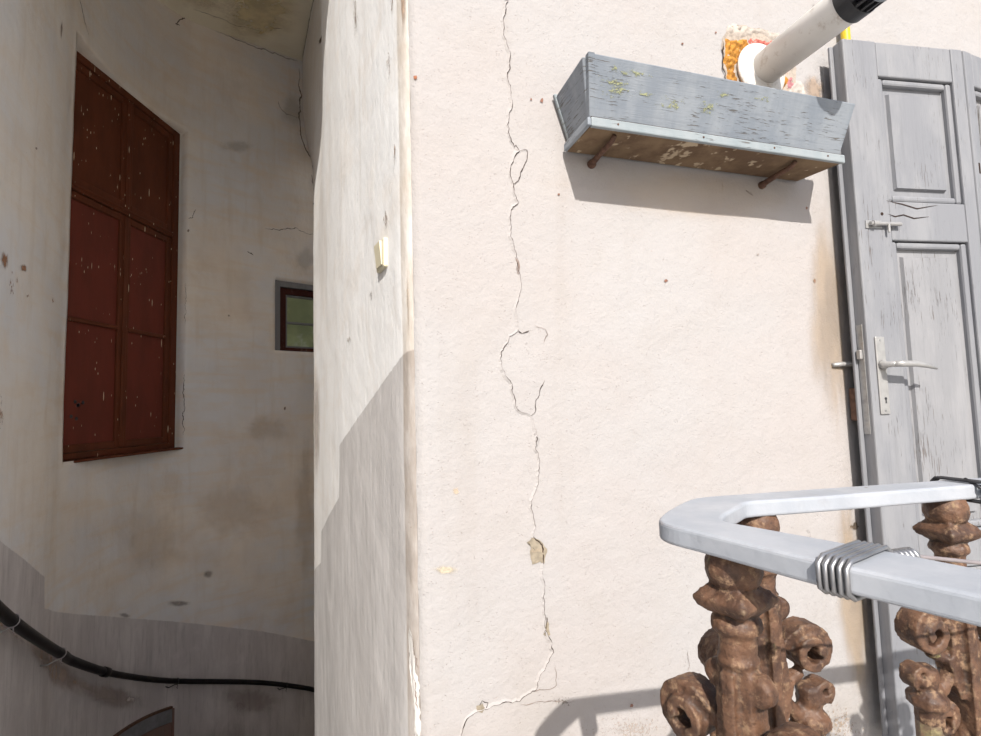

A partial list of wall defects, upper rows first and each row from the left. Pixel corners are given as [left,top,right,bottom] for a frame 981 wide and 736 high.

crack [175,0,314,205]
crack [498,0,548,538]
crack [459,563,569,736]
flaking render [527,536,547,564]